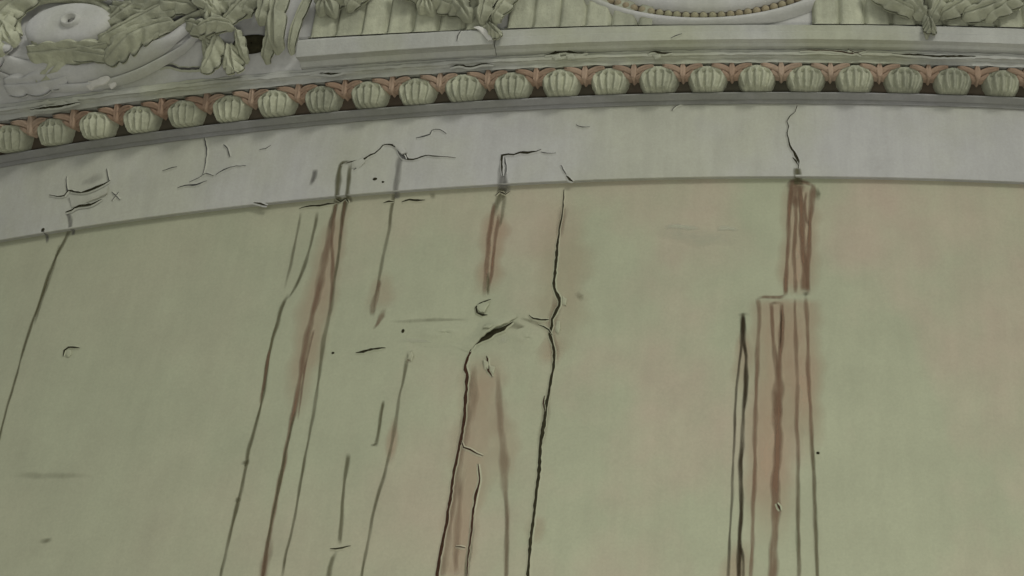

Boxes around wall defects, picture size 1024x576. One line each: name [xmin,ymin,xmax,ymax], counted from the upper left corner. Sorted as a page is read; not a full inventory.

crack [341,128,456,171]
crack [785,105,801,184]
crack [253,200,268,208]
crack [299,202,338,210]
crack [383,197,425,205]
corrosion [485,207,500,292]
spalling [452,298,518,378]
crack [499,148,574,576]
corrosion [752,180,815,576]
corrosion [262,281,322,576]